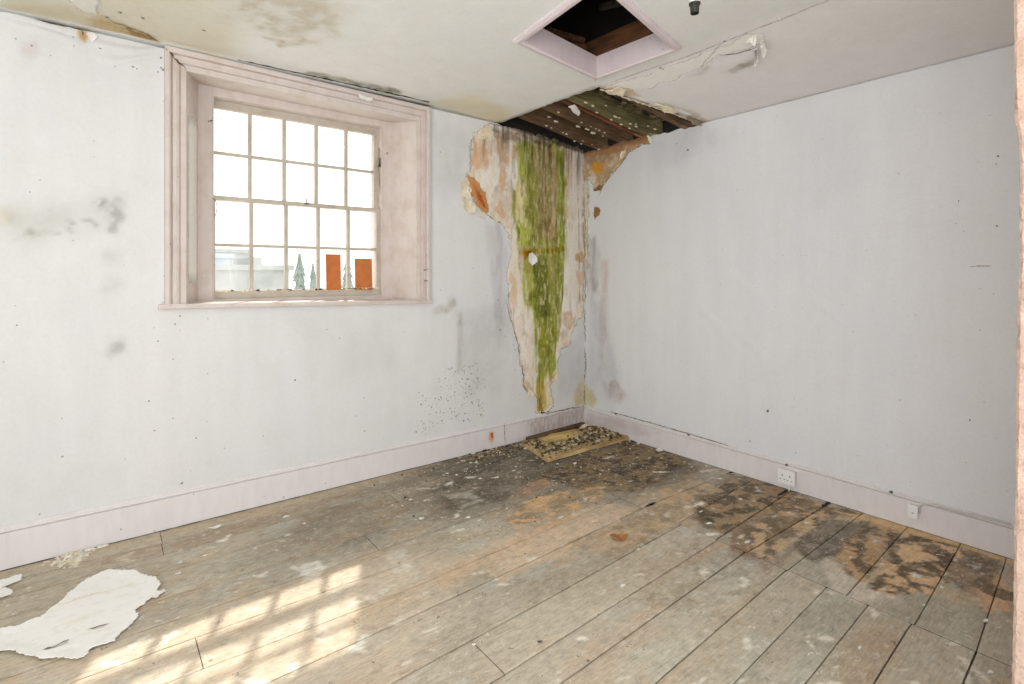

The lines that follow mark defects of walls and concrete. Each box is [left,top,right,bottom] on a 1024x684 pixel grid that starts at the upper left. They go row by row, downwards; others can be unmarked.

crack [595,0,829,85]
peeling [461,123,654,414]